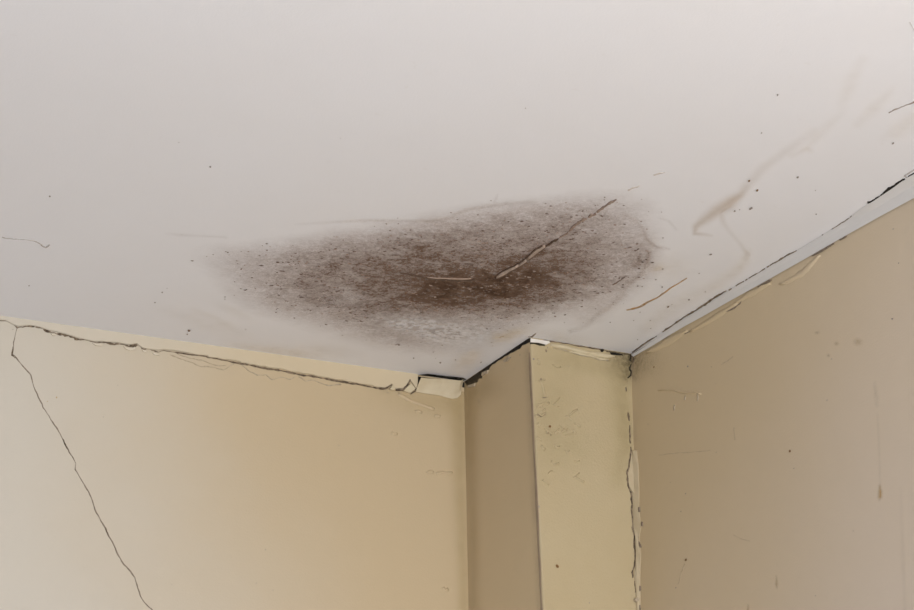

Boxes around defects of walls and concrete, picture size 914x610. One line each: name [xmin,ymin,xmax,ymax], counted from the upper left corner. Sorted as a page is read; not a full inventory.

water stain [266,203,663,346]
crack [496,172,665,279]
peeling [379,370,489,399]
crack [528,169,914,610]
crack [0,320,379,610]